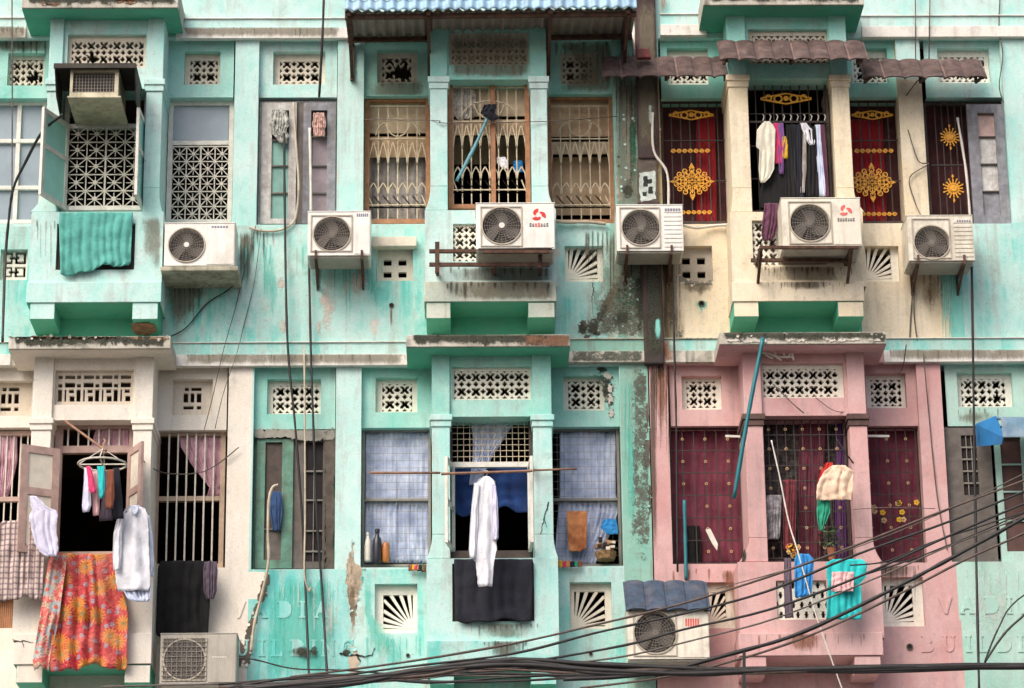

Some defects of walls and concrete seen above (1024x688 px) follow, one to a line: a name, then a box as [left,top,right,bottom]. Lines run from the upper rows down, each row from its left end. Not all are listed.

peeling [602,371,614,417]
water stain [572,232,683,561]
peeling [254,427,365,673]